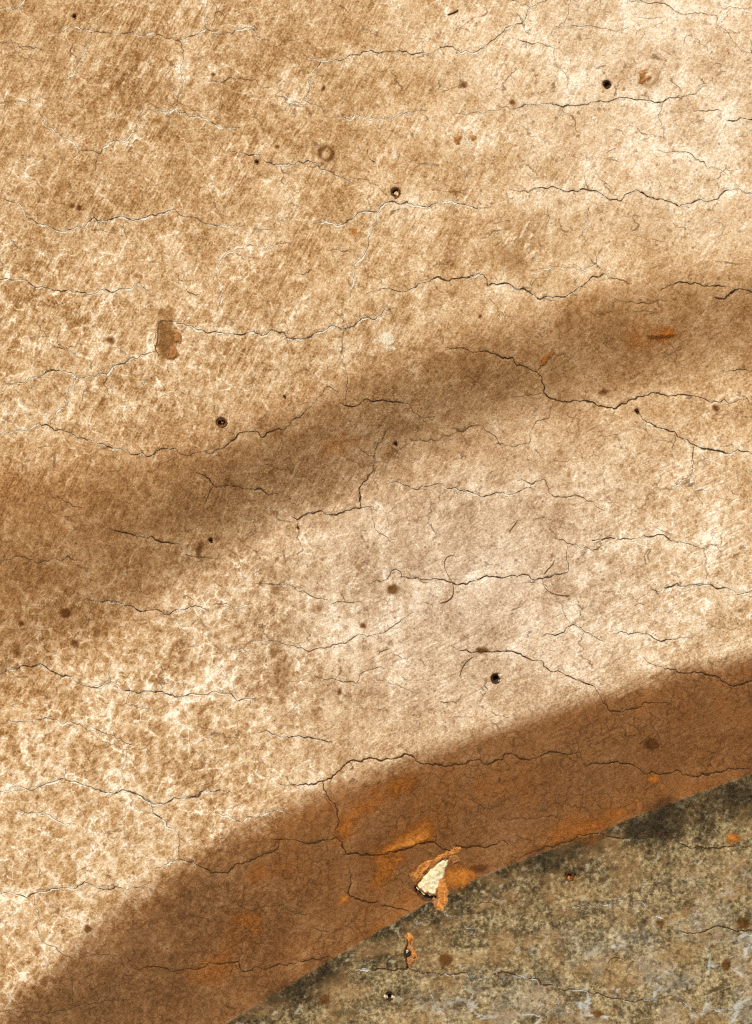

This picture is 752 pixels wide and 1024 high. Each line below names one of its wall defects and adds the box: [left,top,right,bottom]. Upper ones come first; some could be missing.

crack [0,0,752,712]
damp [20,918,237,1024]
damp [169,800,341,996]
crack [1,717,752,1022]
rust [375,821,432,882]
spalling [408,845,462,911]
rust [445,869,473,885]
damp [310,667,752,970]